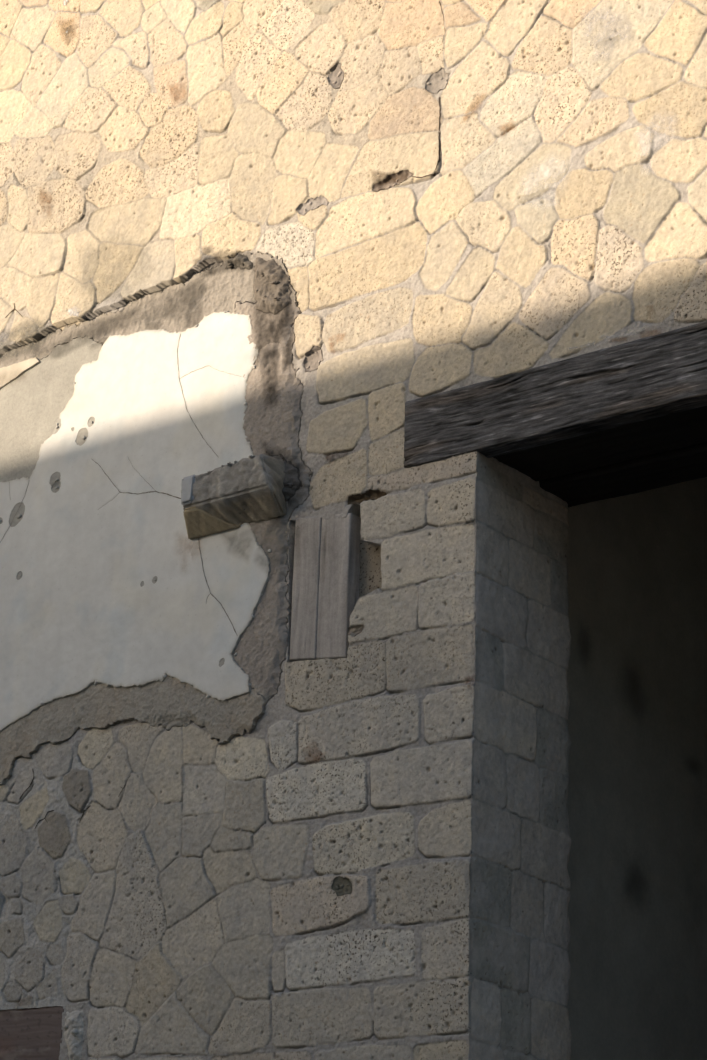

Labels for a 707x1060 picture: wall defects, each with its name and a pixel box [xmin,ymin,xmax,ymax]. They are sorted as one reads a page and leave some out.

spalling [372,170,413,192]
crack [177,334,241,458]
crack [93,458,181,510]
peeling [0,251,323,785]
crack [198,538,236,633]